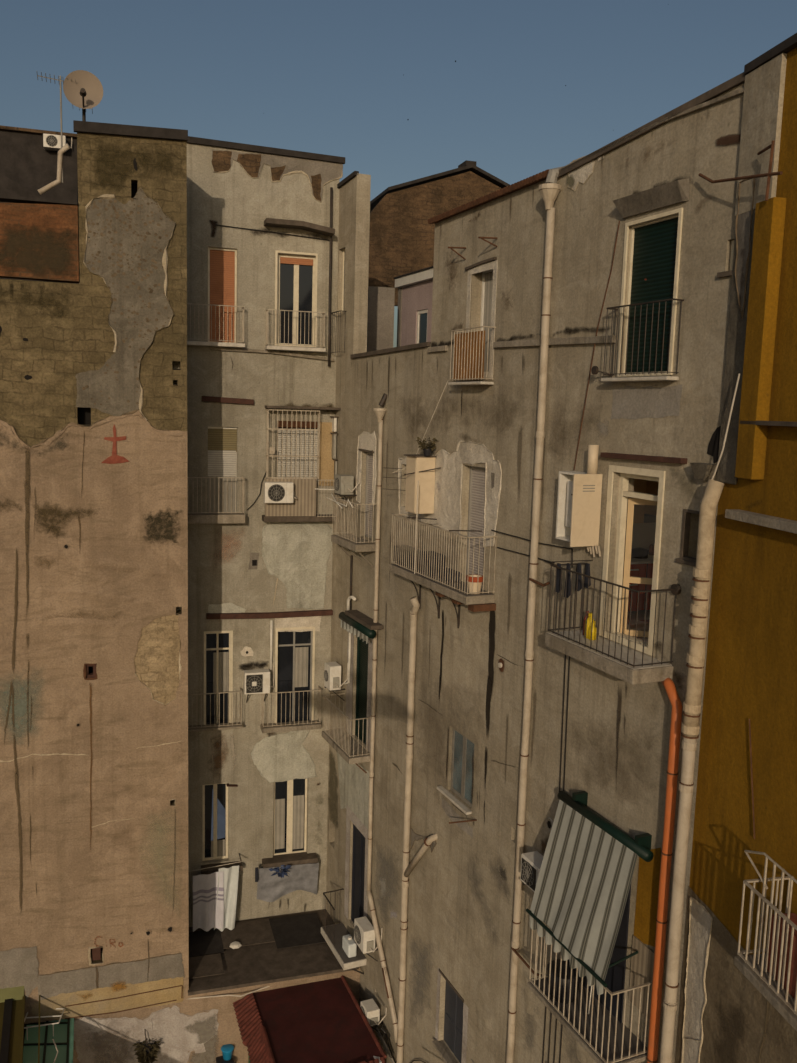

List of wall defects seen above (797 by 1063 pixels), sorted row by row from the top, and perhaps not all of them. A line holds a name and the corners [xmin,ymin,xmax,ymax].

spalling [211,150,343,203]
spalling [0,134,187,449]
leakage [146,511,178,543]
spalling [432,440,502,547]
peeling [208,603,246,613]
leakage [0,434,91,910]
leakage [486,575,511,735]
leakage [471,748,487,824]
peeling [74,1005,219,1063]